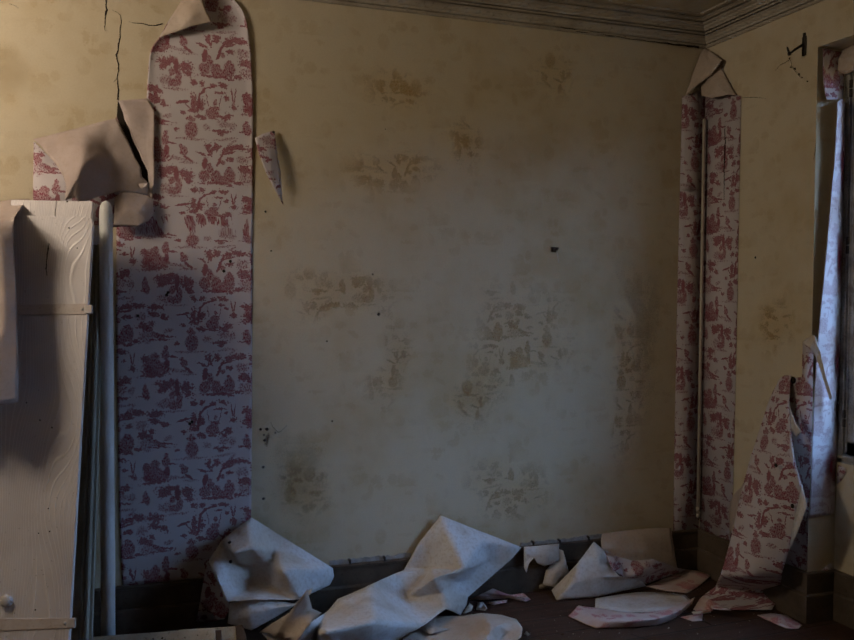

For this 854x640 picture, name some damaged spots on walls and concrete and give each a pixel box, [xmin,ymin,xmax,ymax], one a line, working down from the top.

crack [104,0,163,182]